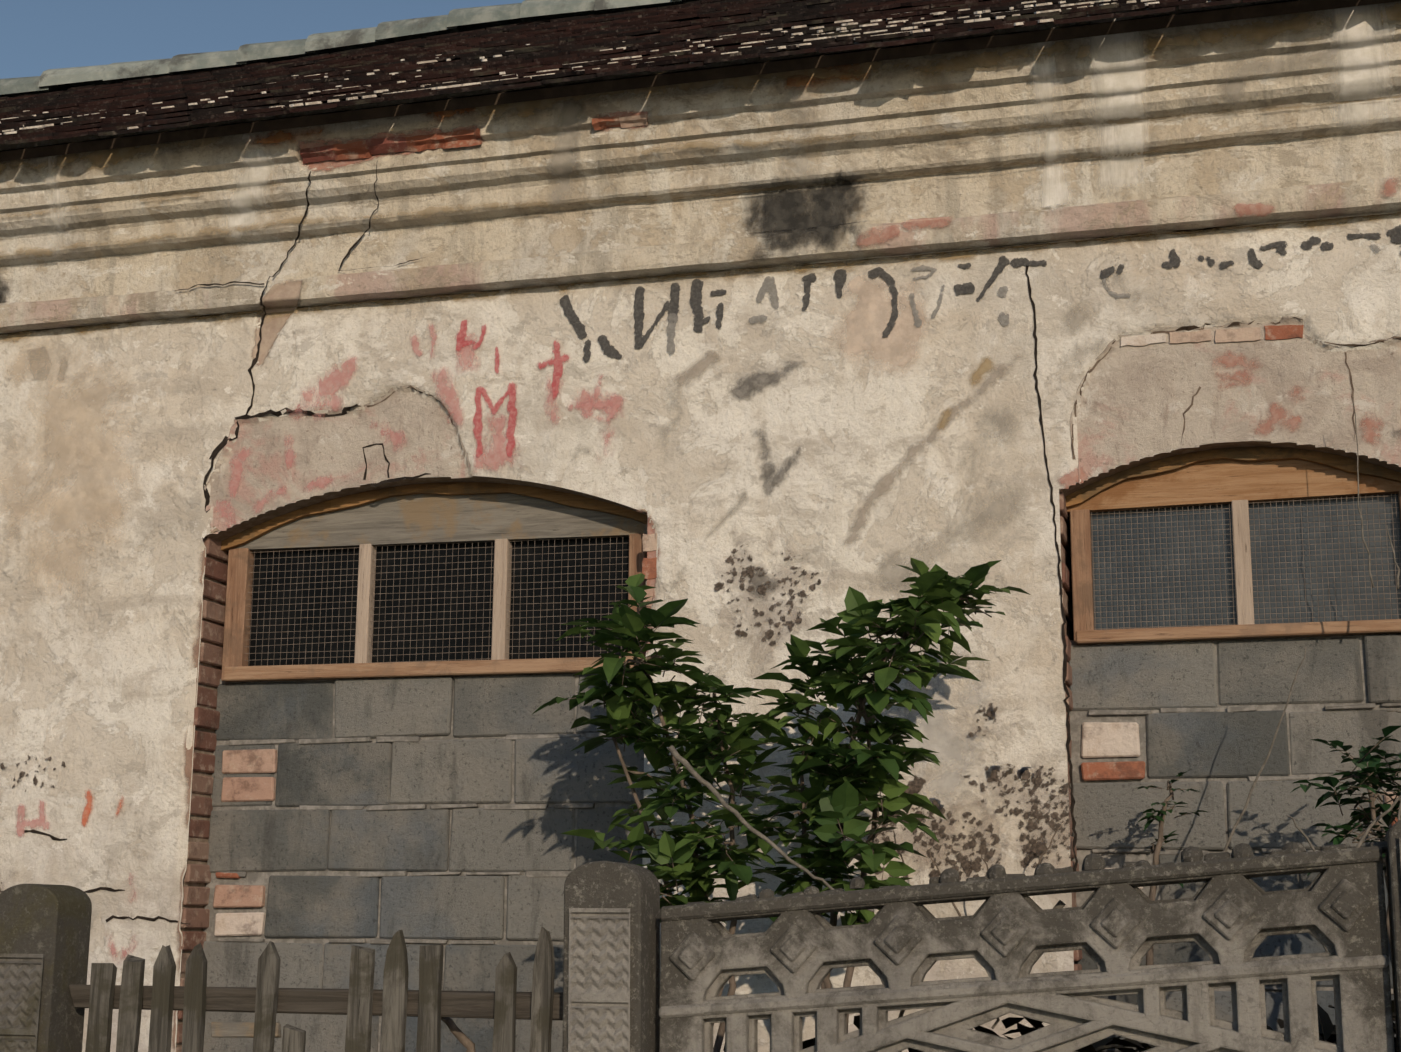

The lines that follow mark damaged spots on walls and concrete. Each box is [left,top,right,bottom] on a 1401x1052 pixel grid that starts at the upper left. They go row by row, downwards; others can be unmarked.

crack [175,165,463,513]
peeling [200,386,471,584]
spalling [299,126,482,171]
water stain [189,281,597,321]
water stain [620,134,879,282]
water stain [714,545,821,646]
water stain [353,2,1401,219]
crack [1025,265,1116,872]
water stain [902,212,1401,260]
peeling [1059,317,1401,489]
crack [1151,317,1401,442]
spalling [184,602,202,826]